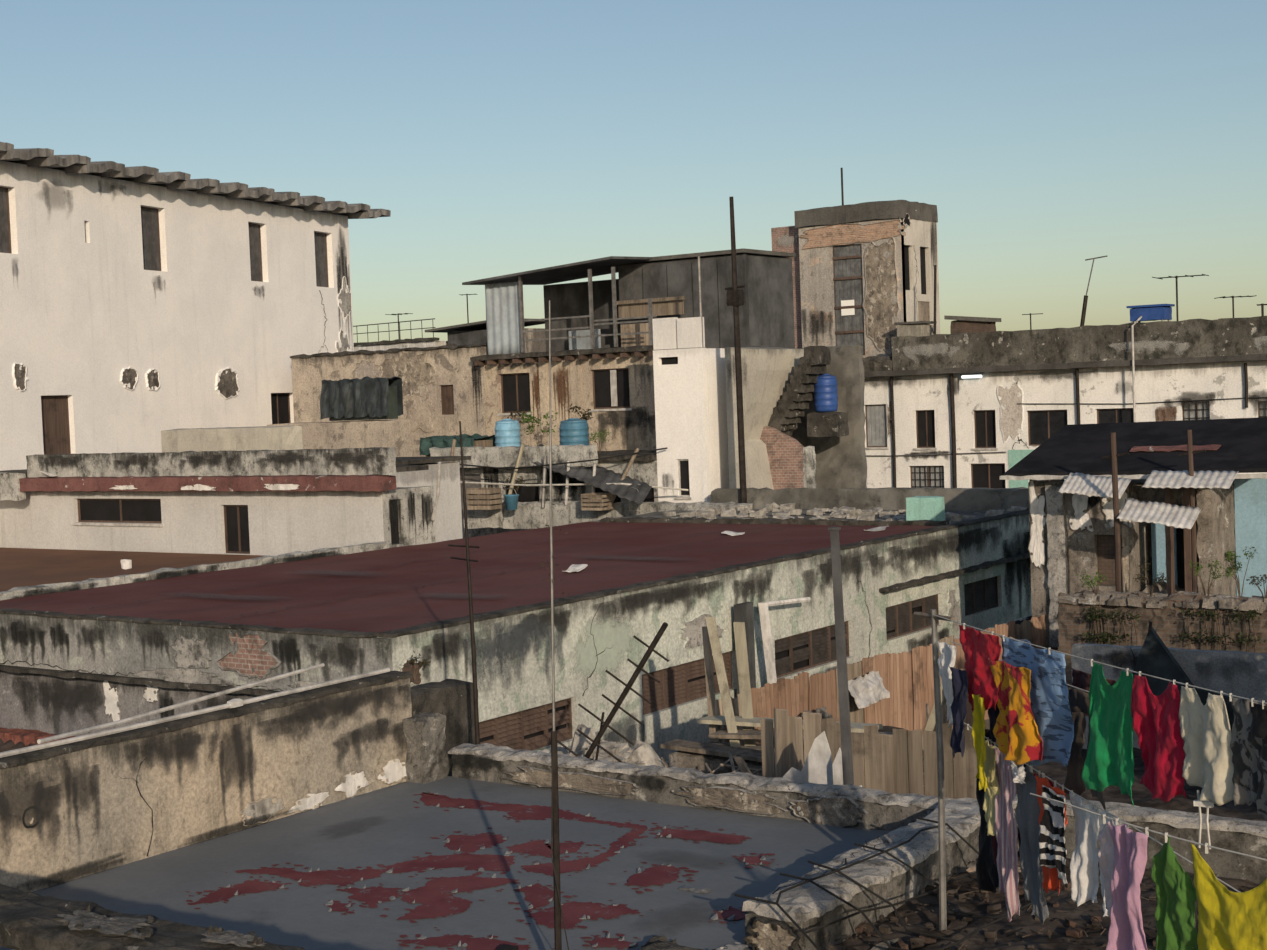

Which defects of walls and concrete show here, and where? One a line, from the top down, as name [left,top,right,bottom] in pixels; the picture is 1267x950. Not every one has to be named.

spalling [120,366,161,391]
spalling [215,367,240,400]
water stain [804,527,1031,609]
water stain [0,620,103,661]
peeling [102,674,122,726]
spalling [132,629,281,703]
water stain [273,639,364,681]
water stain [422,609,570,677]
water stain [128,685,413,804]
water stain [0,764,99,834]
spalling [238,757,407,826]
peeling [186,792,779,950]